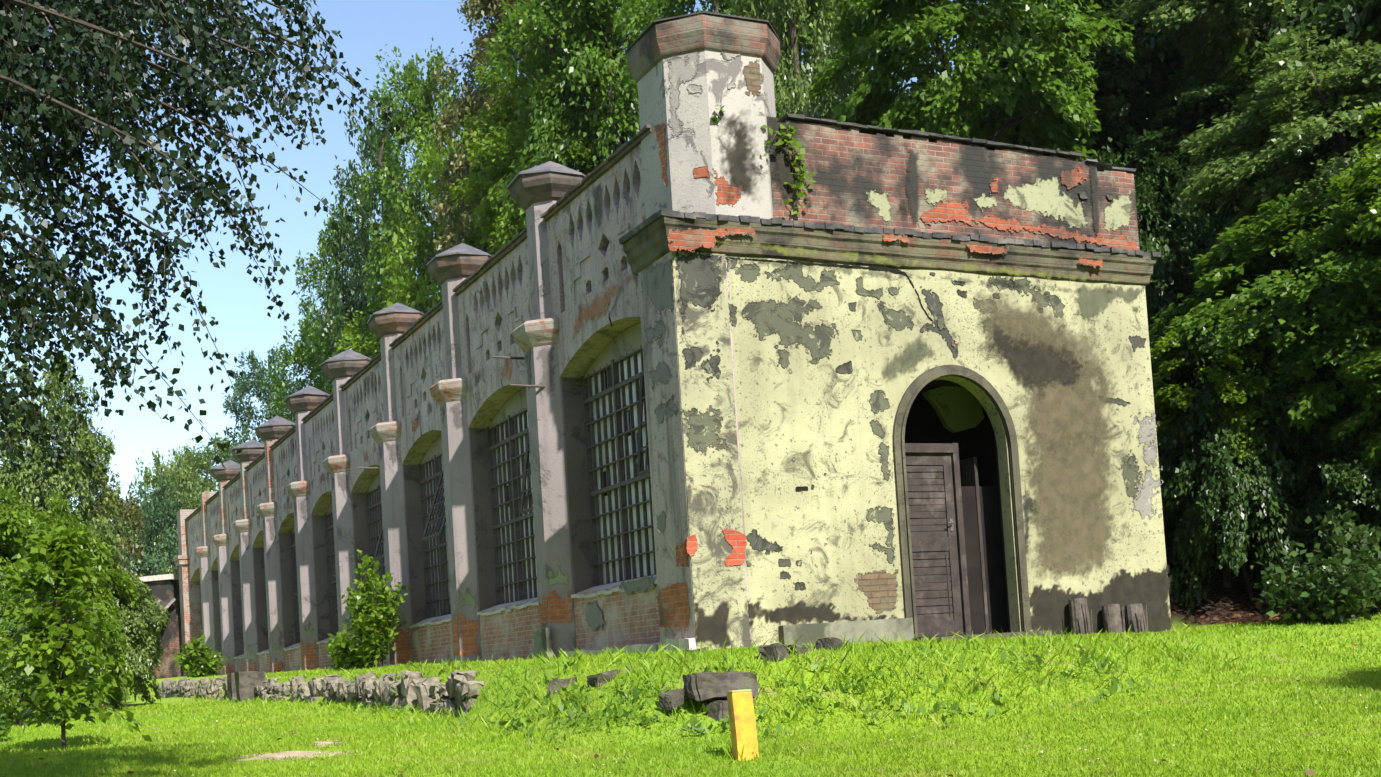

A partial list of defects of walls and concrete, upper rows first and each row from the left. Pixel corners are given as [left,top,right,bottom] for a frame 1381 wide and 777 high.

spalling [693,166,742,206]
damp [722,117,825,207]
peeling [866,189,910,242]
spalling [920,166,1139,268]
damp [956,264,1142,319]
damp [980,296,1172,636]
spalling [619,534,698,633]
spalling [723,529,806,590]
spalling [855,506,899,613]
spalling [451,588,482,657]
damp [693,595,733,649]
damp [748,598,897,642]